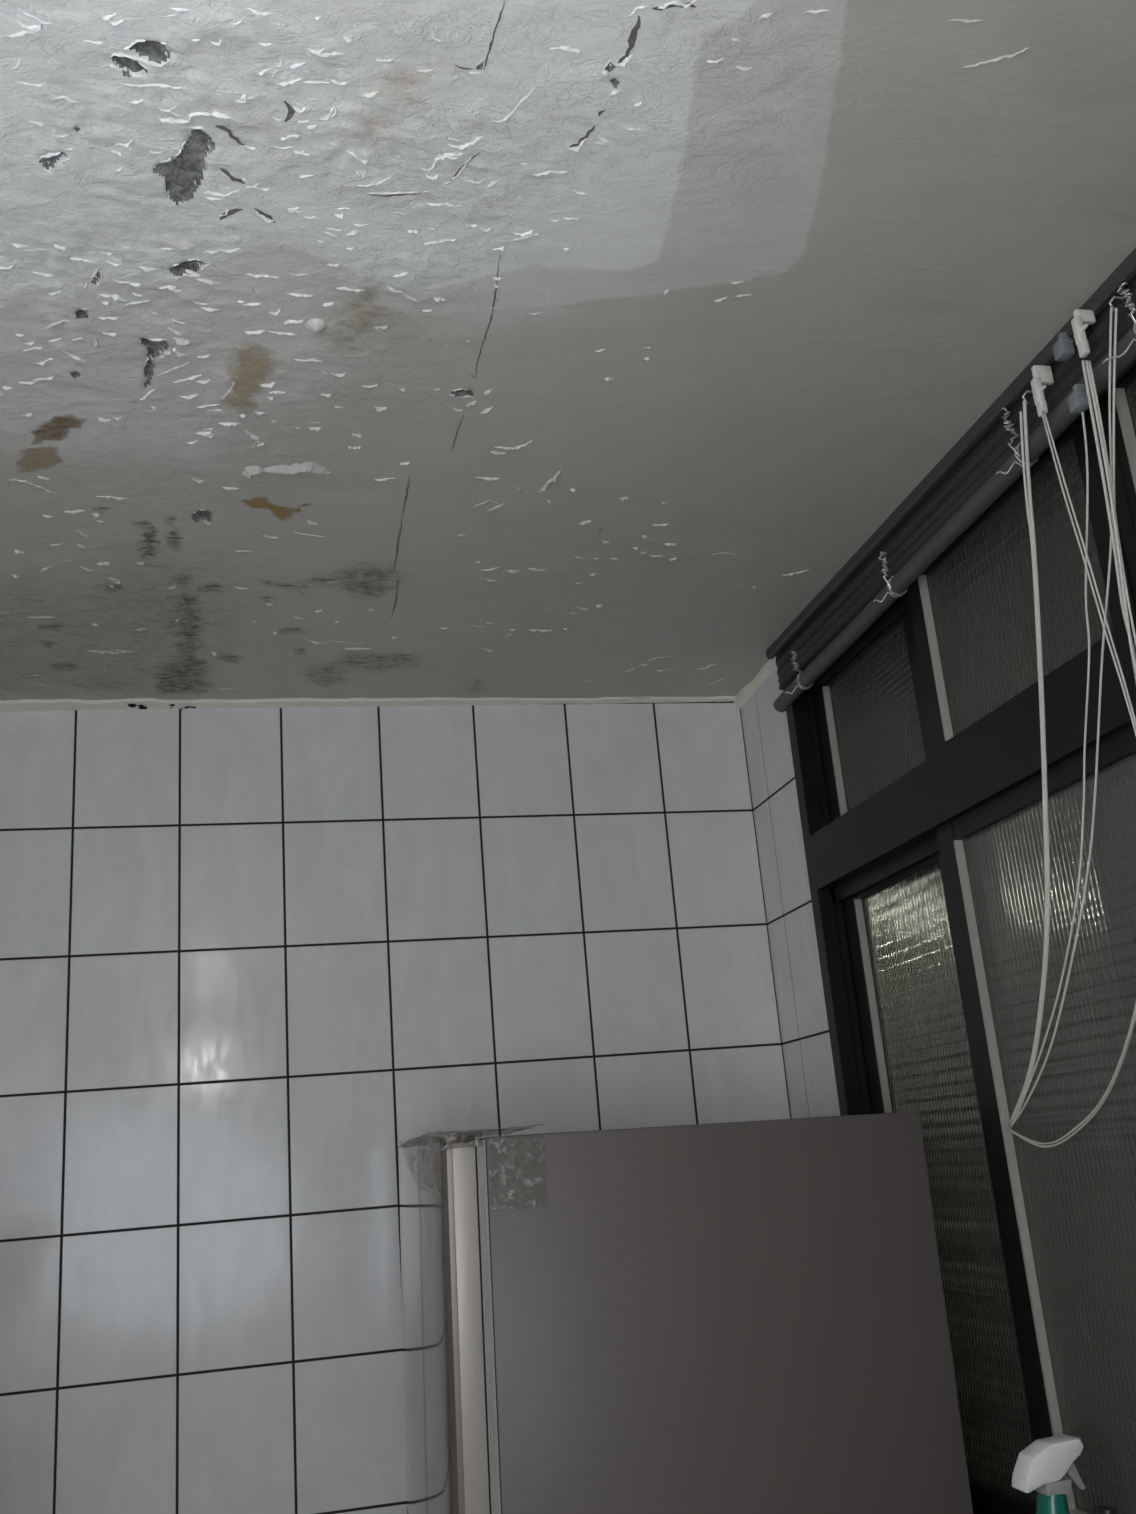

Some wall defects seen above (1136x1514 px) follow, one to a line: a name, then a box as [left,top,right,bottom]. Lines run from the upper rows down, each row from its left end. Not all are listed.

peeling [258,37,379,98]
crack [455,1,505,70]
peeling [602,55,632,96]
crack [607,2,695,71]
spalling [28,121,82,174]
spalling [84,39,270,216]
crack [569,110,605,148]
peeling [358,135,500,245]
peeling [237,207,369,348]
peeling [0,240,331,490]
corrosion [18,417,81,472]
corrosion [245,499,309,519]